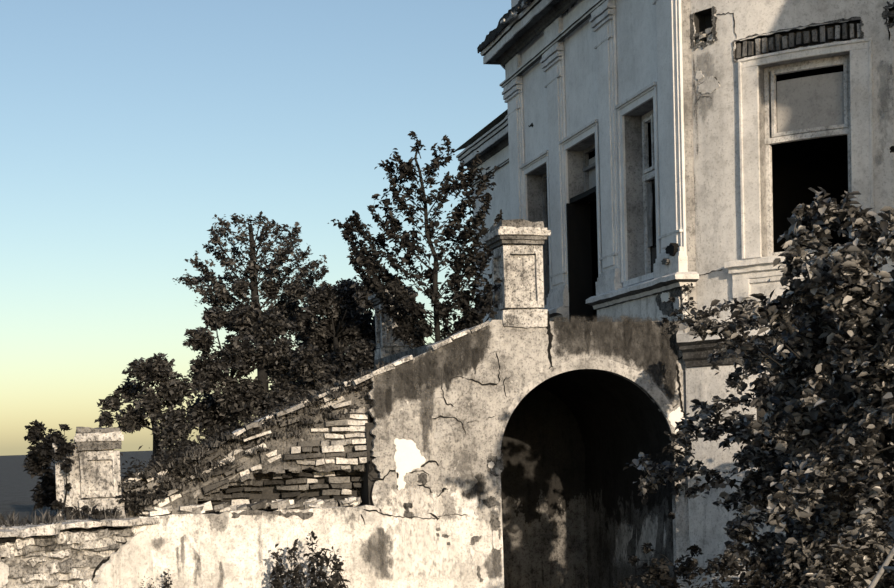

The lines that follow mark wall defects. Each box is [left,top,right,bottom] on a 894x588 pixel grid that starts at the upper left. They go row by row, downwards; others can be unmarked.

hole [689,6,718,51]
flaking render [732,16,864,63]
spalling [881,1,894,29]
leakage [372,326,491,452]
crack [432,353,510,433]
crack [545,311,553,369]
leakage [554,315,679,399]
crack [361,459,466,524]
flaking render [408,473,428,485]
leakage [363,477,458,580]
leakage [470,512,502,578]